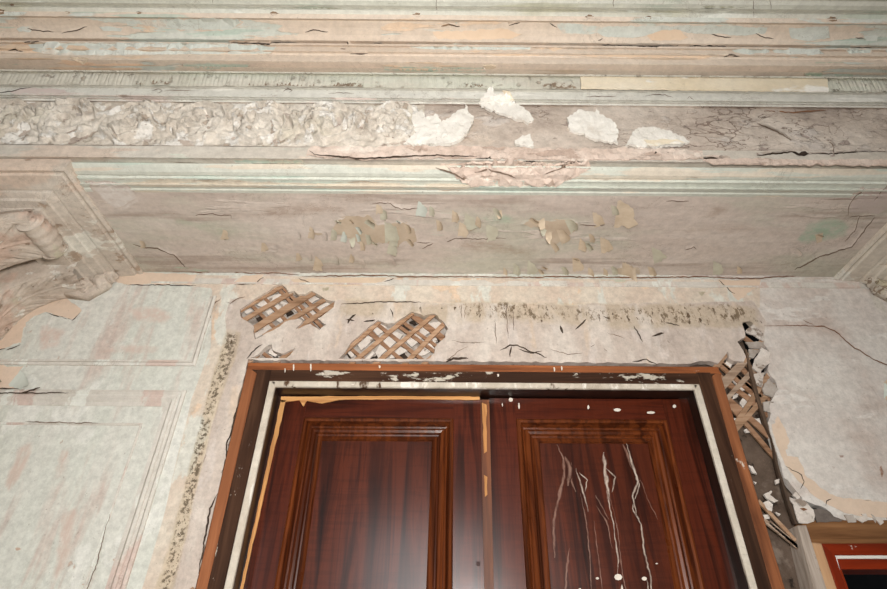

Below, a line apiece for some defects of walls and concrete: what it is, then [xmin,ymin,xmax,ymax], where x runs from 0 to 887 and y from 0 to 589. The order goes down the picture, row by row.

crack [310,151,515,180]
crack [546,147,586,174]
spalling [306,144,887,167]
crack [756,110,887,157]
peeling [290,201,502,288]
crack [210,186,887,318]
peeling [520,200,667,282]
peeling [0,298,82,350]
crack [344,301,417,323]
crack [764,317,887,365]
peeling [0,365,28,390]
peeling [772,422,887,525]